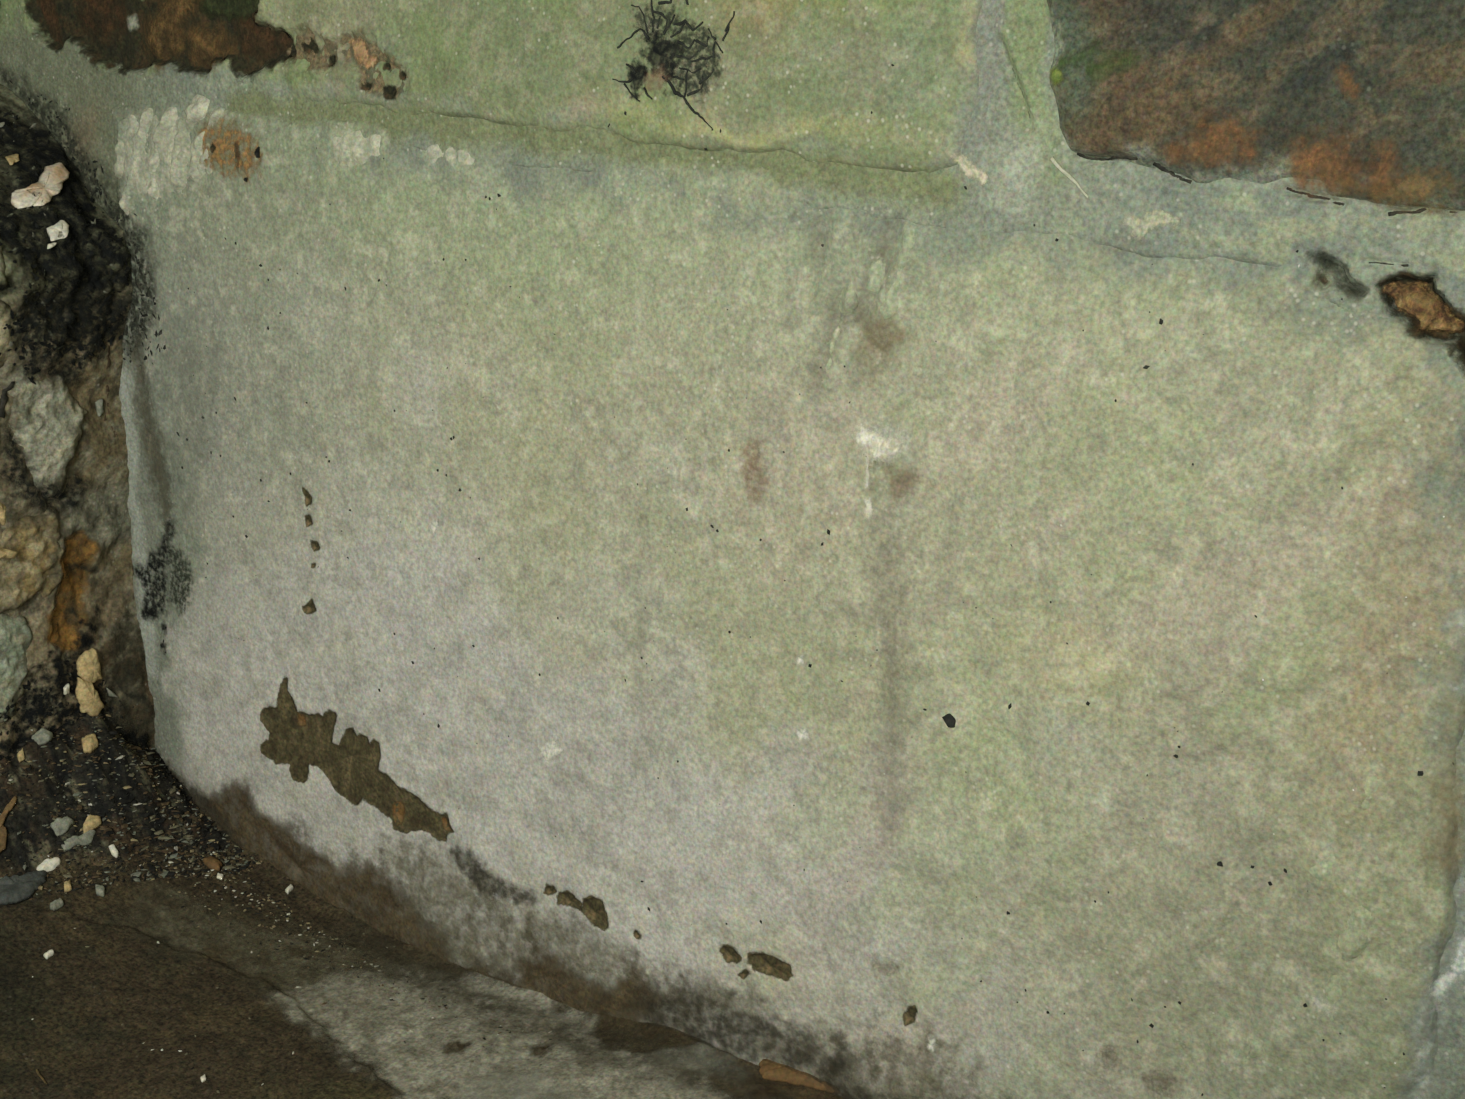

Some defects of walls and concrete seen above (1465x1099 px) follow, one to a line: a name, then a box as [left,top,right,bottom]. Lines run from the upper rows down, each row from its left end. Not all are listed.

spalling [25,0,408,100]
spalling [199,119,262,182]
spalling [1313,252,1465,370]
peeling [302,487,319,568]
peeling [302,598,316,614]
peeling [260,677,454,841]
water stain [132,770,968,1099]
peeling [543,884,608,931]
peeling [719,945,793,981]